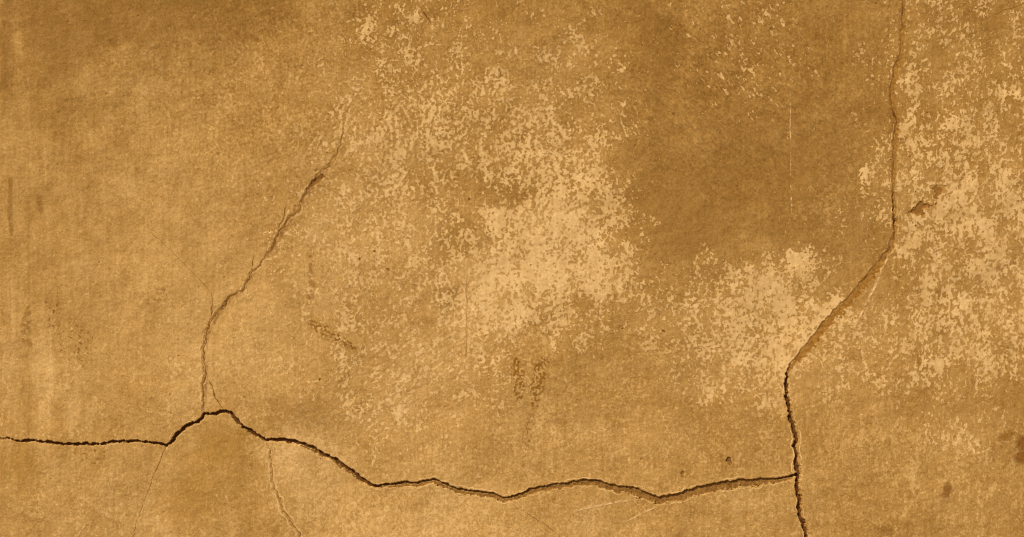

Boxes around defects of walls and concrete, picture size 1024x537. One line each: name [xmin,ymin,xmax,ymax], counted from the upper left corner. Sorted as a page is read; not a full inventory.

crack [889,0,906,123]
crack [0,121,899,537]